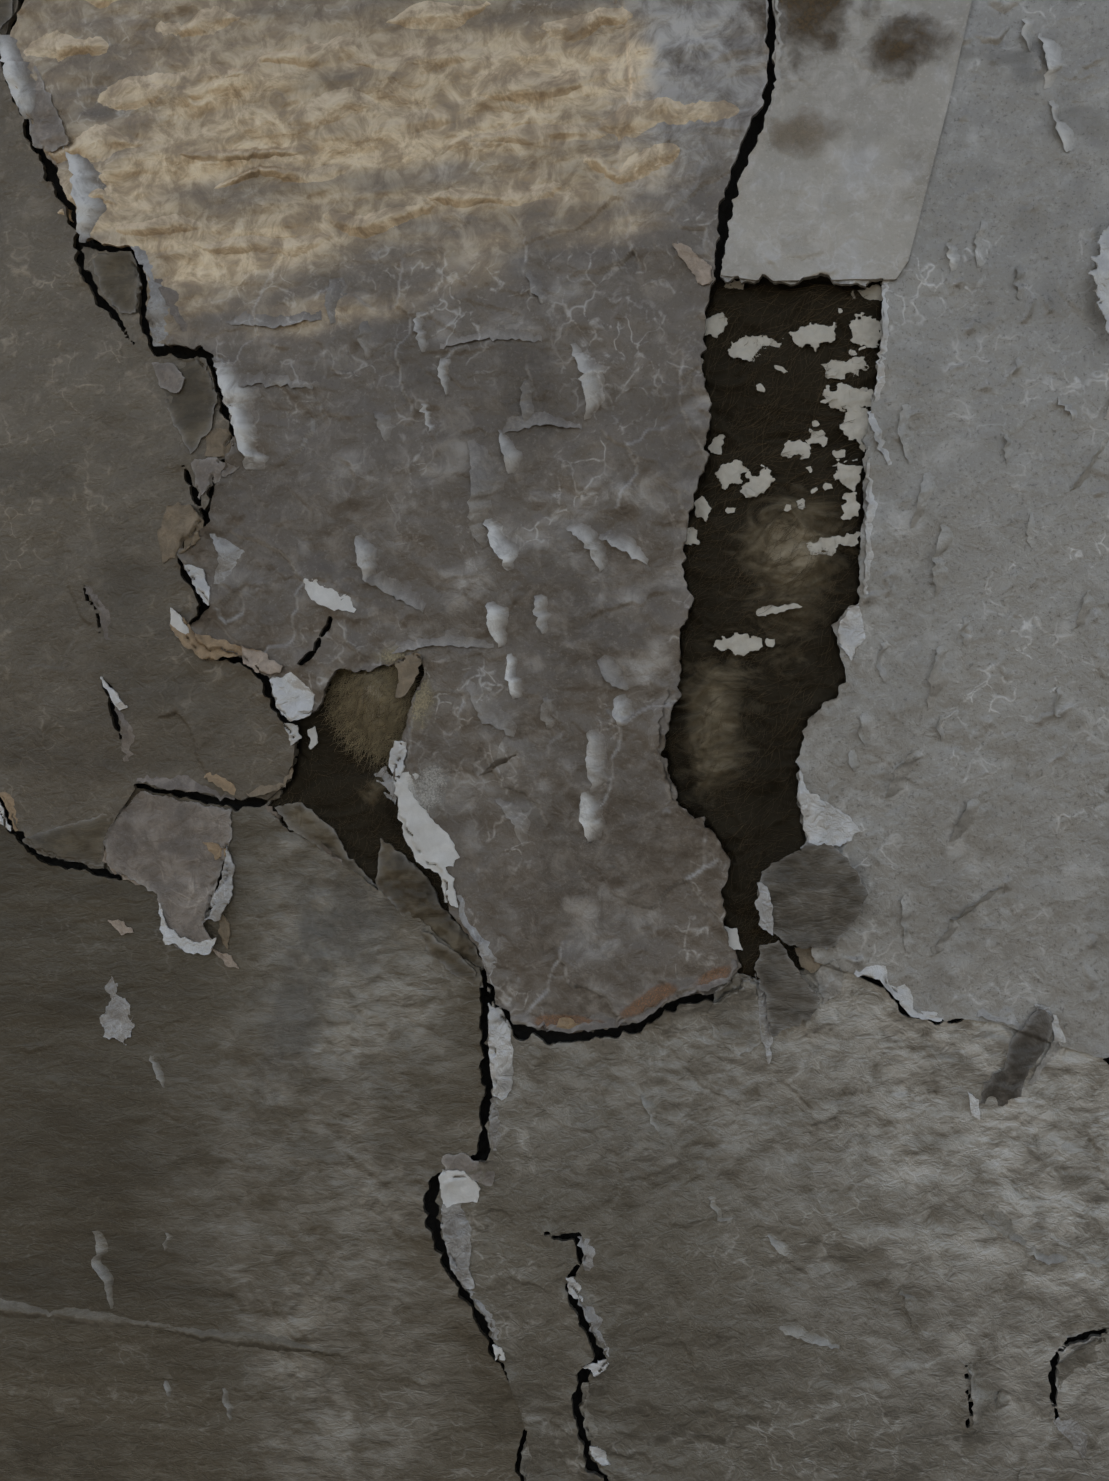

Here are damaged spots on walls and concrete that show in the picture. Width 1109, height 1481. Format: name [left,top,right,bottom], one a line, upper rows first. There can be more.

water stain [750,0,842,49]
water stain [874,15,932,74]
crack [714,0,788,281]
peeling [1088,226,1109,334]
crack [0,0,356,880]
peeling [838,603,866,661]
peeling [103,791,239,969]
peeling [99,977,135,1045]
crack [854,965,1020,1029]
peeling [968,1004,1066,1120]
crack [424,957,738,1373]
crack [545,1231,617,1481]